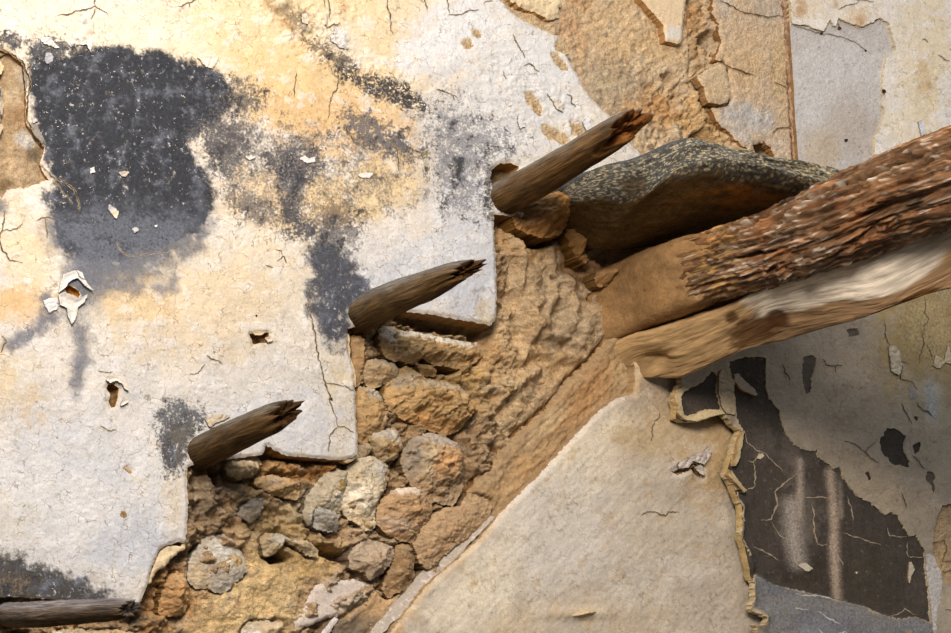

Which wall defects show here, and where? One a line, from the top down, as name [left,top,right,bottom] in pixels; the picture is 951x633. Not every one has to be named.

spalling [0,53,46,198]
damp [0,4,532,352]
spalling [500,0,795,160]
damp [69,325,89,395]
damp [148,398,206,480]
spalling [0,222,654,633]
crack [307,285,354,452]
peeling [667,355,951,622]
crack [845,441,879,463]
peeling [888,345,902,376]
crack [884,297,951,424]
damp [0,553,111,600]